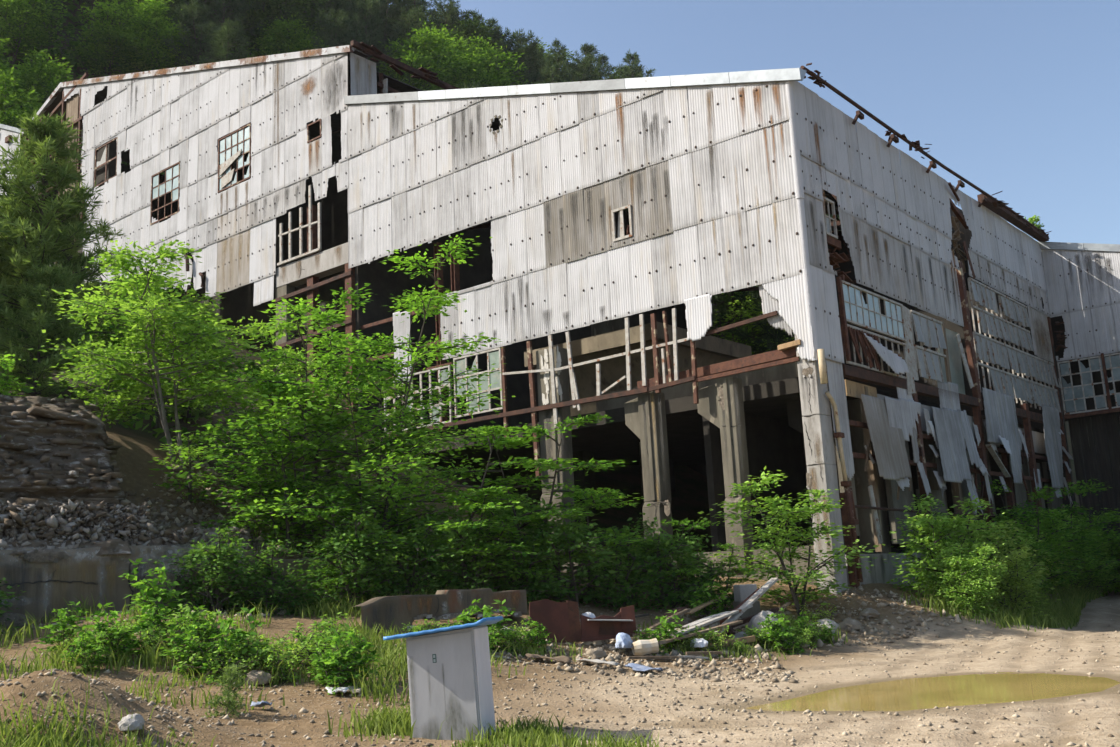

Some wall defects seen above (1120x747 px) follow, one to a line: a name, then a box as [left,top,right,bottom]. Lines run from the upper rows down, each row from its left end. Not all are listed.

corrosion [739,85,779,114]
corrosion [764,116,783,168]
water stain [546,192,605,229]